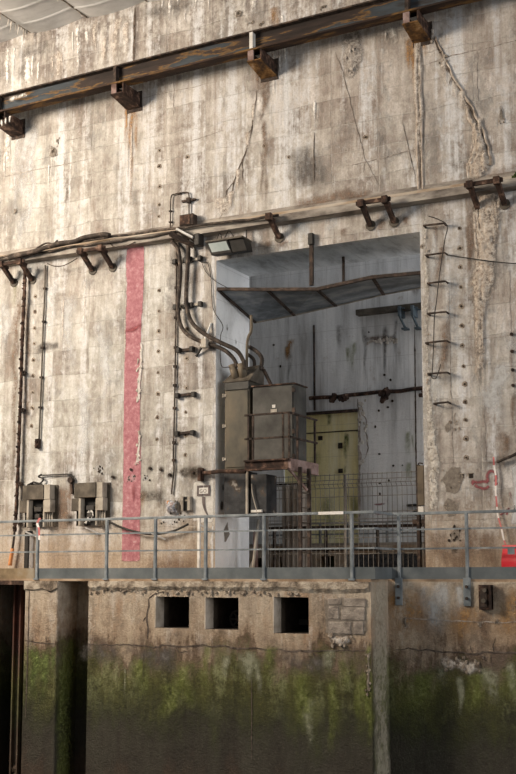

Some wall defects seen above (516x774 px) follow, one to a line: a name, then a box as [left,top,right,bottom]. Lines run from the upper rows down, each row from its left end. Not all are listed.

crack [221,92,257,216]
crack [433,38,488,150]
leakage [374,588,388,774]